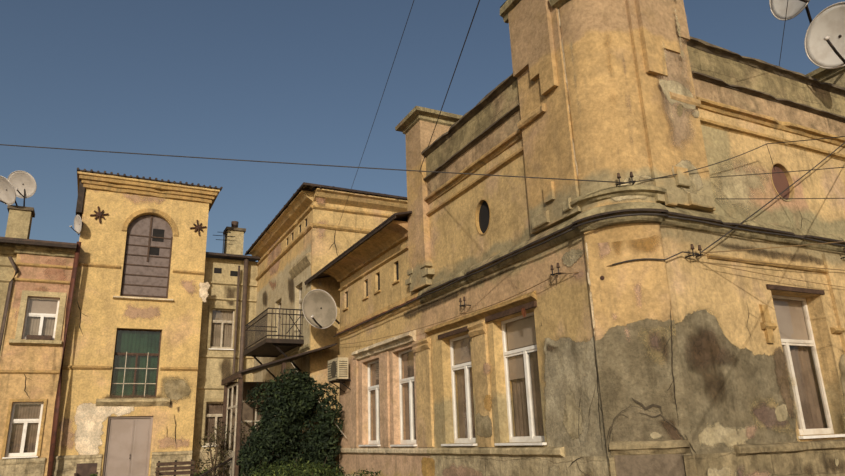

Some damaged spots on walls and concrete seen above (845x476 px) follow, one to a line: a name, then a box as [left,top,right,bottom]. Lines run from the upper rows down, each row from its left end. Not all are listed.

flaking render [182,281,210,302]
spalling [161,377,191,408]
flaking render [476,394,492,438]
crack [568,347,612,476]
spalling [542,271,799,474]
flaking render [708,467,769,476]